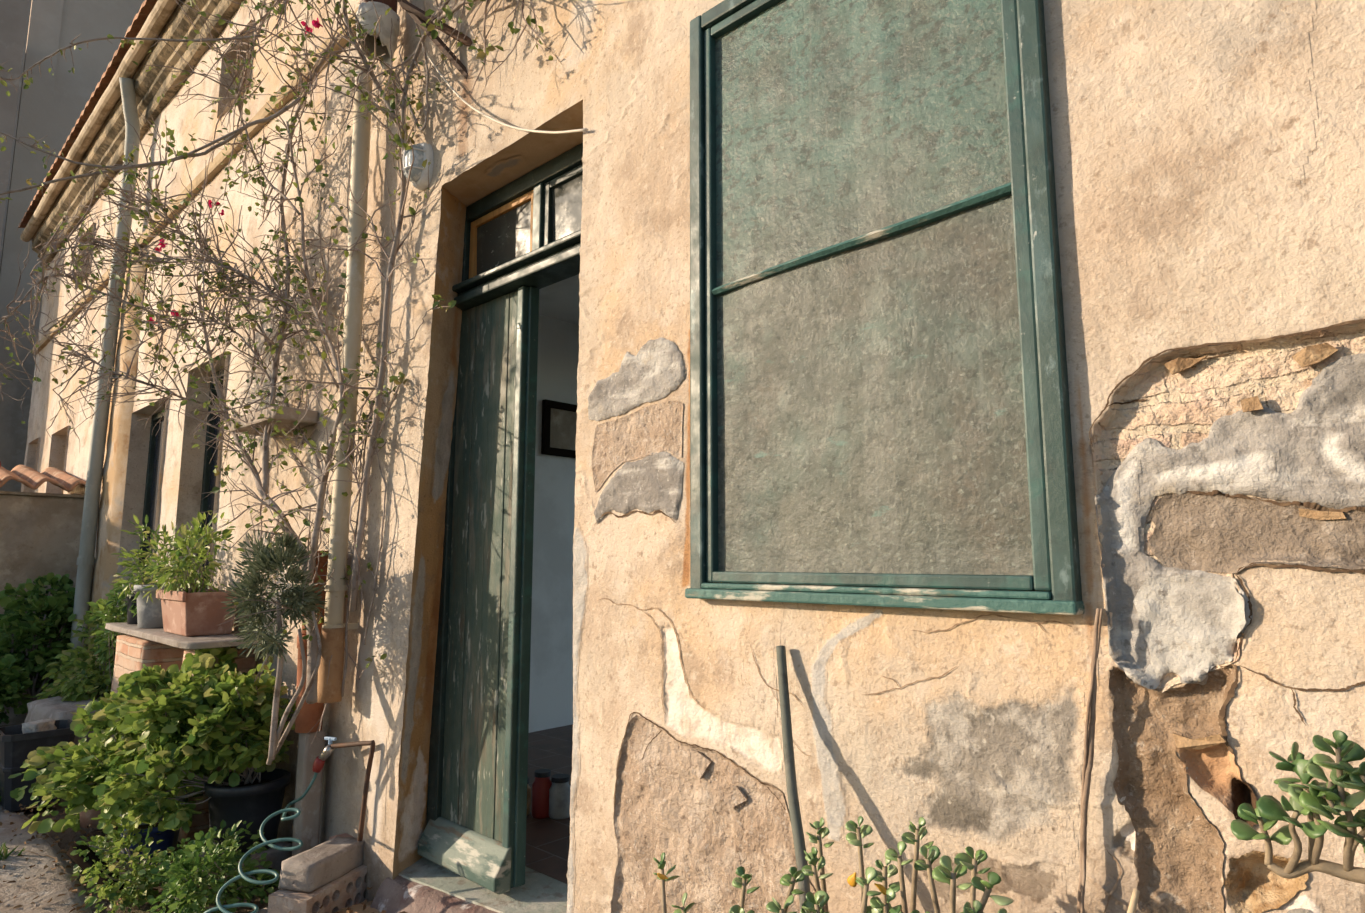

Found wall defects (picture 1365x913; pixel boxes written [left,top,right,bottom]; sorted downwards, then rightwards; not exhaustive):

flaking render [592,400,683,492]
flaking render [1091,321,1365,568]
flaking render [1144,491,1365,596]
flaking render [611,715,816,913]
flaking render [1109,633,1323,913]